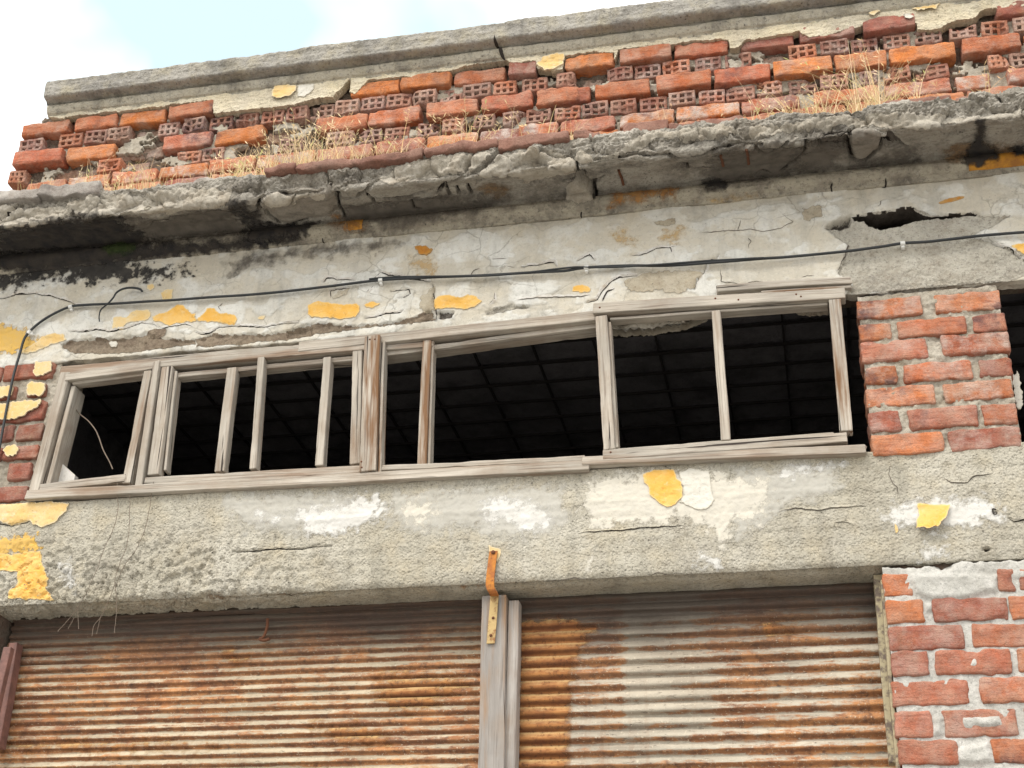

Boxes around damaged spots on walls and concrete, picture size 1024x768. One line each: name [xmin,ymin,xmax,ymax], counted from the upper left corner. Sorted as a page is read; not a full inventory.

damp [945,119,1024,168]
spalling [379,146,597,204]
spalling [0,187,233,229]
damp [0,198,383,293]
spalling [827,196,1024,295]
crack [471,244,677,306]
spalling [0,284,526,420]
crack [232,543,331,552]
crack [578,523,689,533]
rust [374,670,471,716]
rust [519,617,597,768]
rust [4,737,188,753]